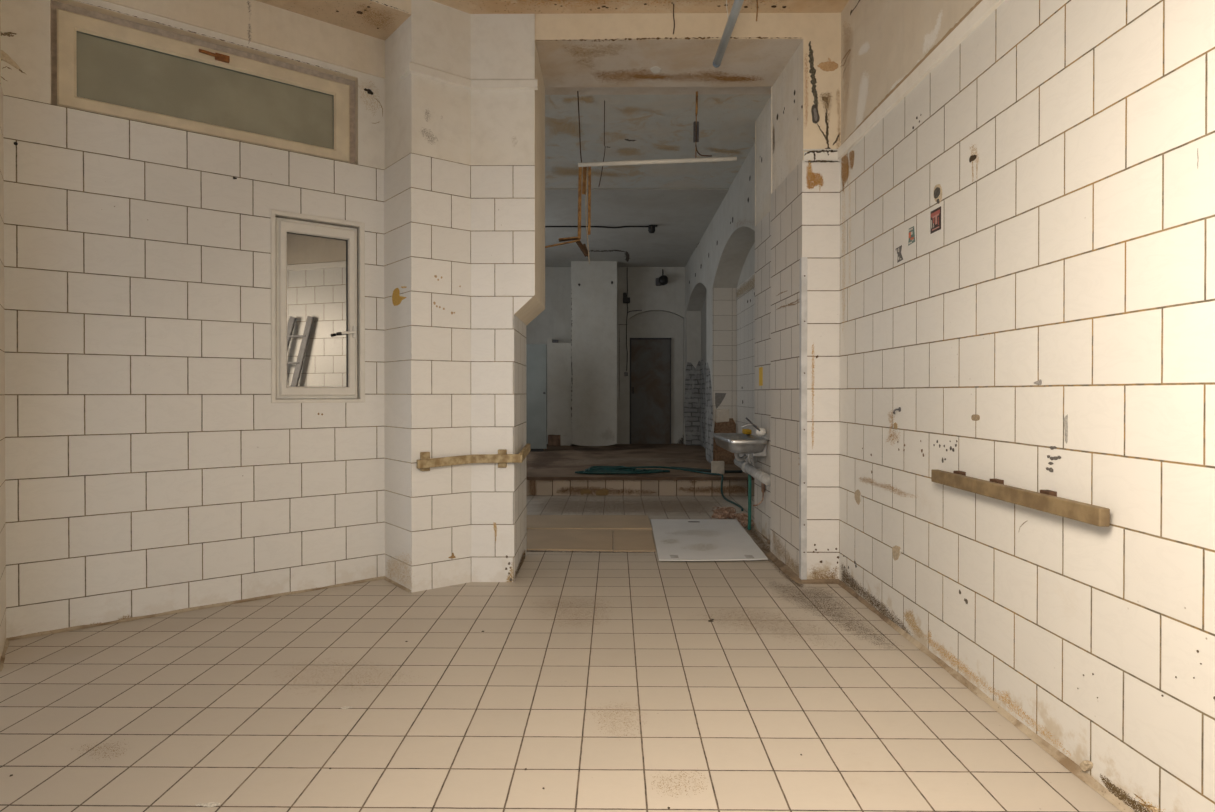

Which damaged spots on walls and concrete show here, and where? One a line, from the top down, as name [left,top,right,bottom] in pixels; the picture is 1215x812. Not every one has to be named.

leakage [537,37,786,84]
leakage [700,530,1071,756]
leakage [1100,773,1164,812]